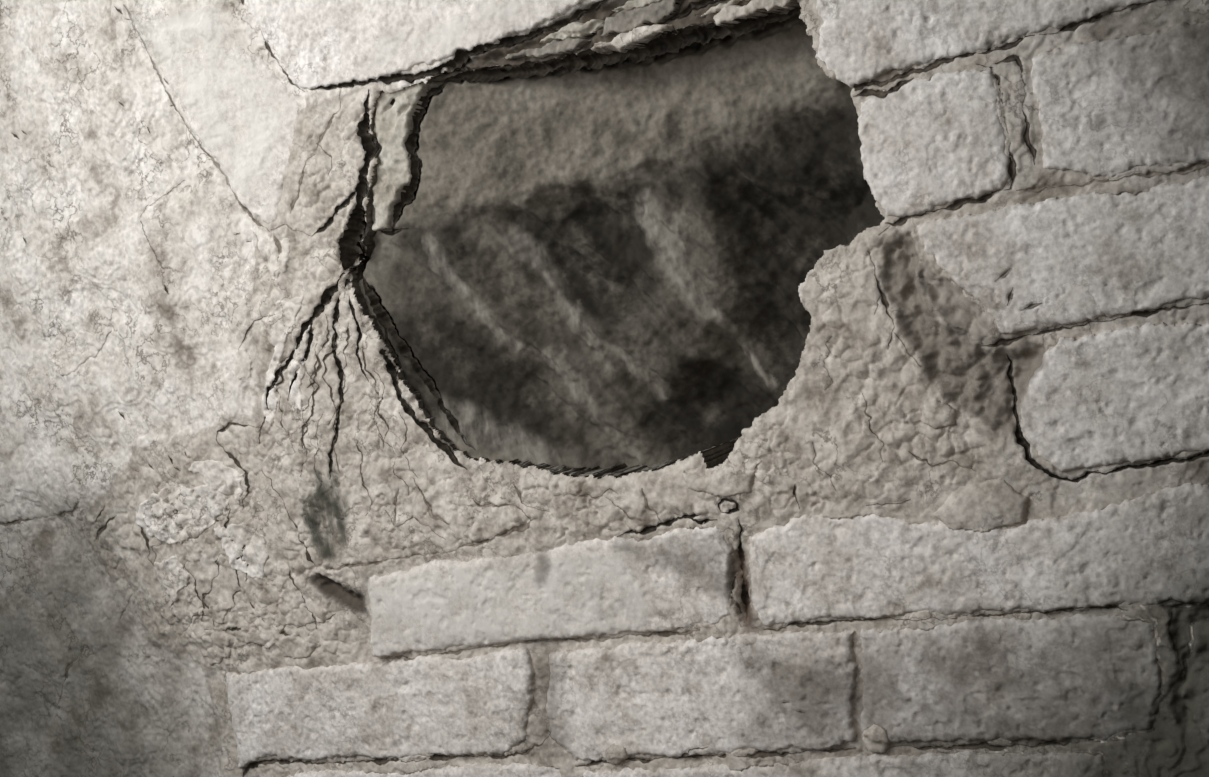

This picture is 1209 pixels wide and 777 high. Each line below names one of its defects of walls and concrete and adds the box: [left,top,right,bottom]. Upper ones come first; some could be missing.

peeling [234,225,290,282]
peeling [261,295,313,426]
crack [0,0,1124,636]
spalling [347,0,800,479]
spalling [884,234,1044,427]
crack [982,303,1209,482]
damp [303,473,347,558]
spalling [310,574,368,613]
spalling [728,550,750,621]